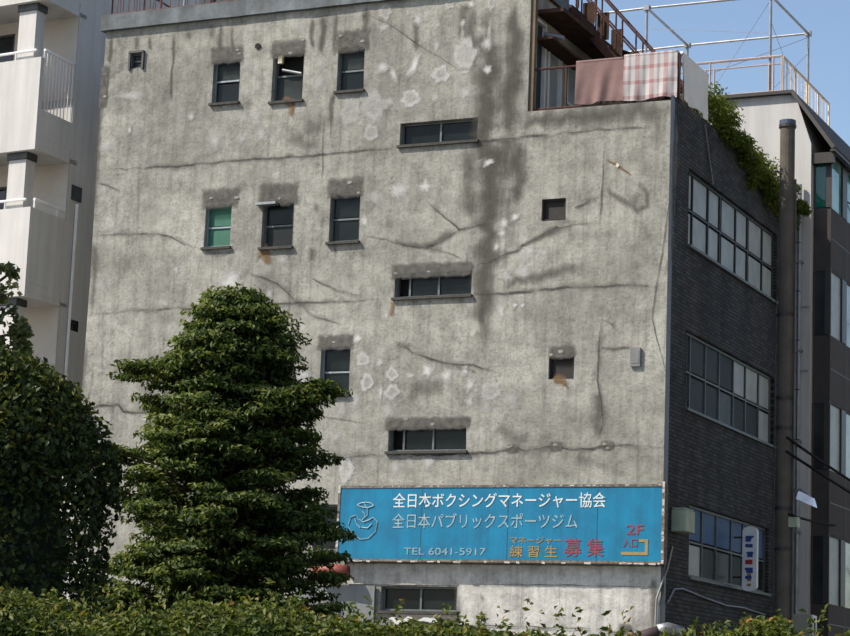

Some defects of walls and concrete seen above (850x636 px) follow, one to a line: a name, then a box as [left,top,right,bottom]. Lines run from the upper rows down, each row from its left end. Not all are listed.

crack [96,93,373,190]
damp [474,12,523,326]
crack [479,126,651,158]
crack [367,179,603,263]
crack [253,274,374,323]
crack [480,286,570,295]
crack [88,396,147,413]
crack [397,322,659,456]